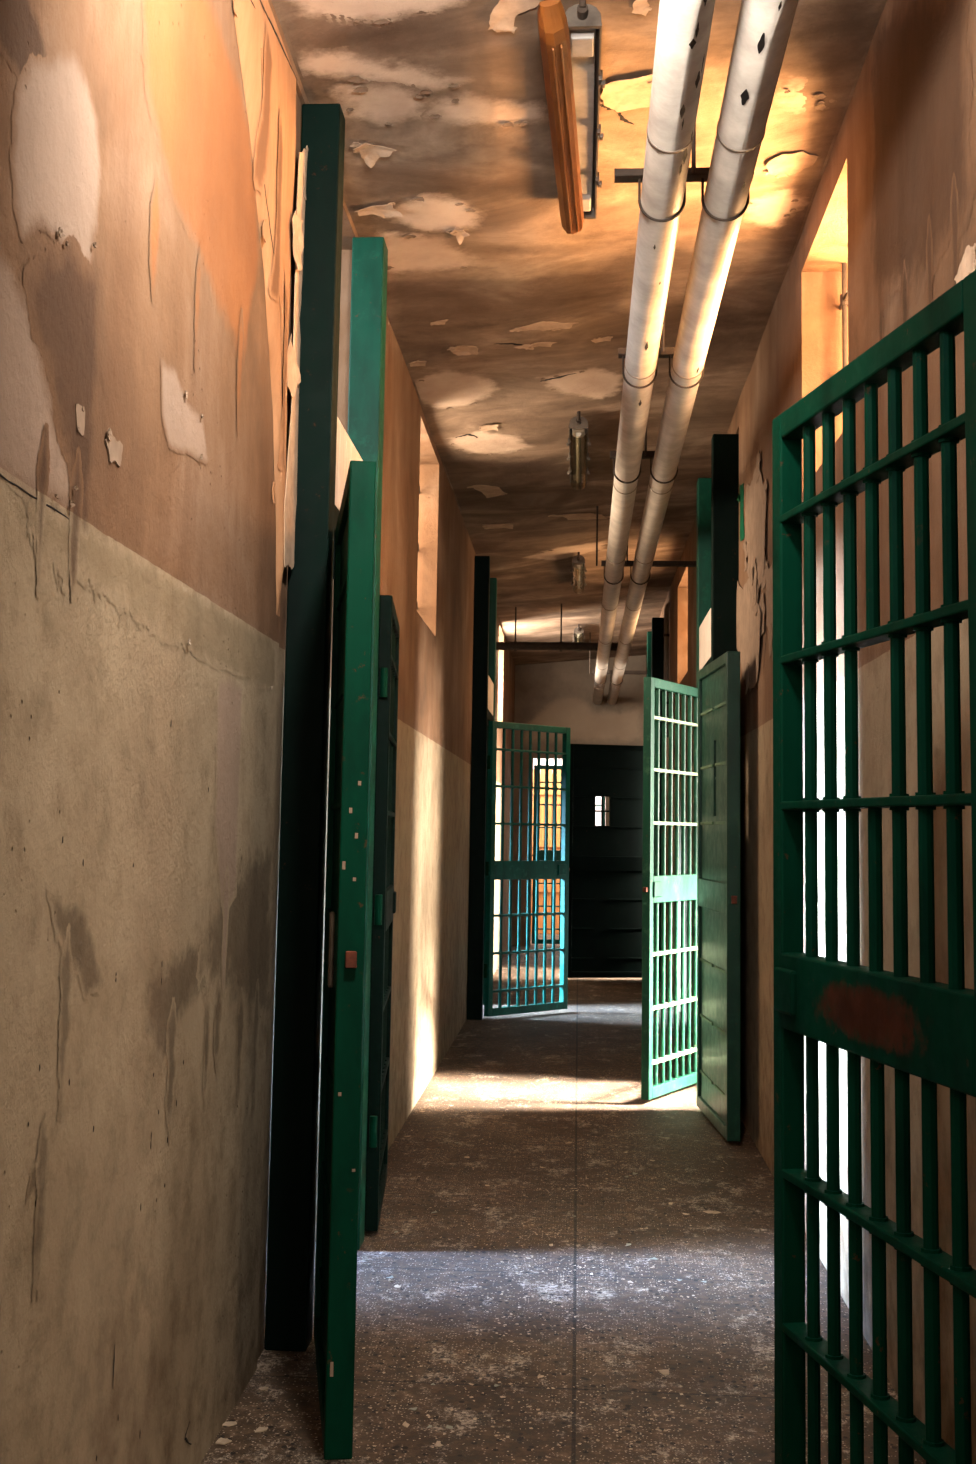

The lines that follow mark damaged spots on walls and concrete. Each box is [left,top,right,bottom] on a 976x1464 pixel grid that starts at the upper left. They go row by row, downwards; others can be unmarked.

peeling [284,0,471,30]
peeling [488,0,543,34]
peeling [294,46,549,168]
peeling [9,47,103,264]
peeling [355,192,489,275]
peeling [0,242,78,515]
peeling [75,404,85,436]
peeling [105,428,123,466]
peeling [160,356,209,465]
peeling [409,345,506,410]
peeling [442,424,537,455]